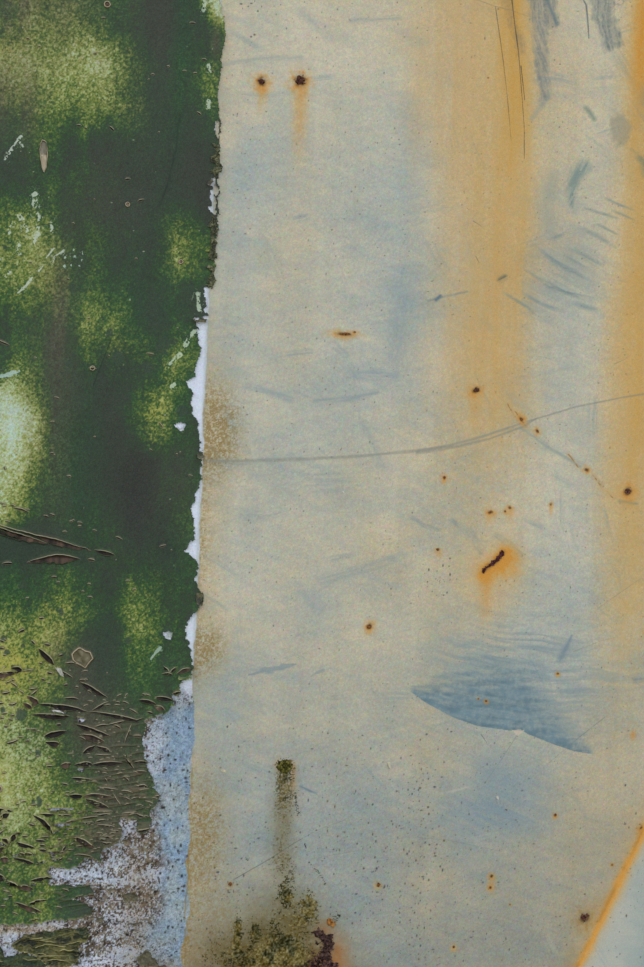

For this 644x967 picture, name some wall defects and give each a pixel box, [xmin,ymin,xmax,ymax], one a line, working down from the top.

corrosion [246,61,320,171]
corrosion [319,327,369,343]
corrosion [565,0,644,755]
peeling [0,286,210,967]
corrosion [360,615,379,638]
water stain [184,764,390,967]
corrosion [305,918,339,967]
corrosion [553,767,644,967]